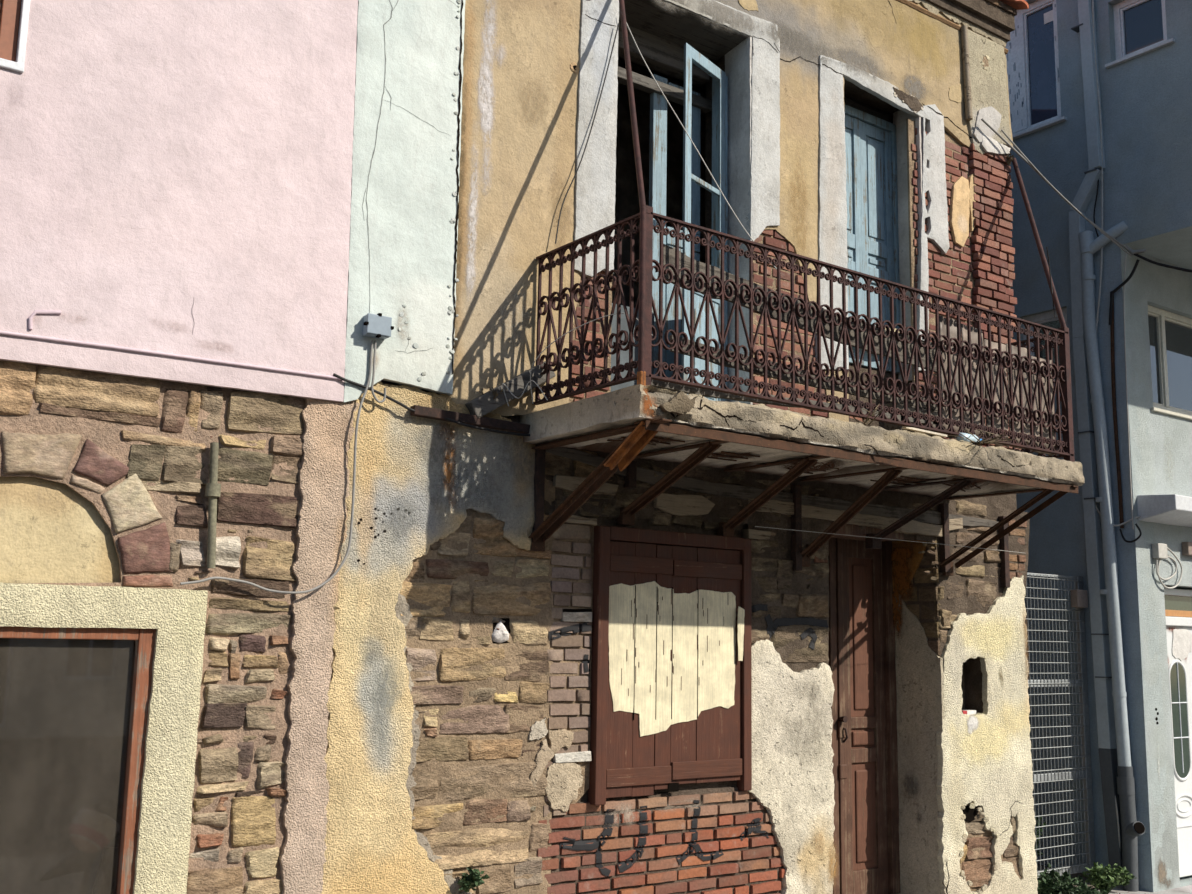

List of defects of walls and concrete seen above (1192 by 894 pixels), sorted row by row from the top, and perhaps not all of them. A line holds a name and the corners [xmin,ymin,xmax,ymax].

crack [362,0,449,313]
spalling [893,84,1017,348]
flaking render [544,437,626,521]
crack [654,390,824,437]
flaking render [564,451,1030,673]
spalling [400,509,785,894]
spalling [959,803,1022,894]